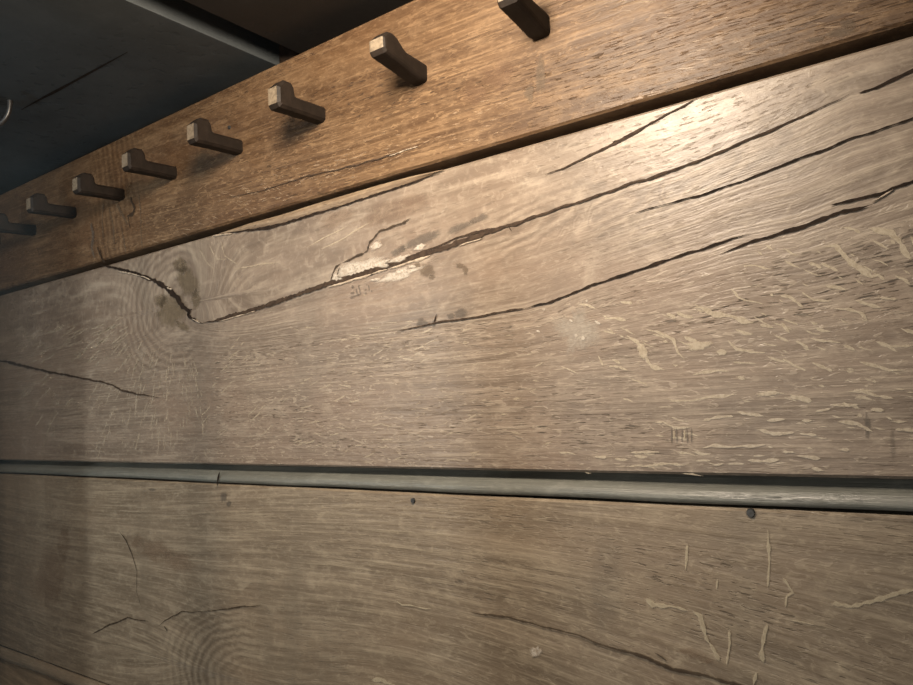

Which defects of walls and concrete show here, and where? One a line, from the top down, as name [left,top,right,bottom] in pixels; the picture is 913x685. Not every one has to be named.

crack [97,68,913,331]
crack [0,360,158,398]
crack [471,612,741,685]